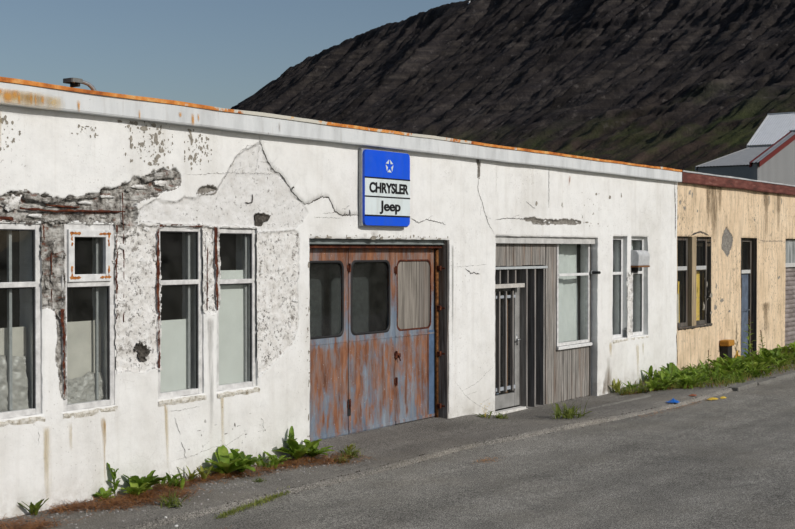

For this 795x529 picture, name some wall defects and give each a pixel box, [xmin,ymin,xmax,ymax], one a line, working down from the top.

corrosion [0,90,56,105]
spalling [0,120,310,399]
corrosion [156,224,201,368]
crack [187,134,359,219]
spalling [524,193,608,227]
spalling [721,228,733,257]